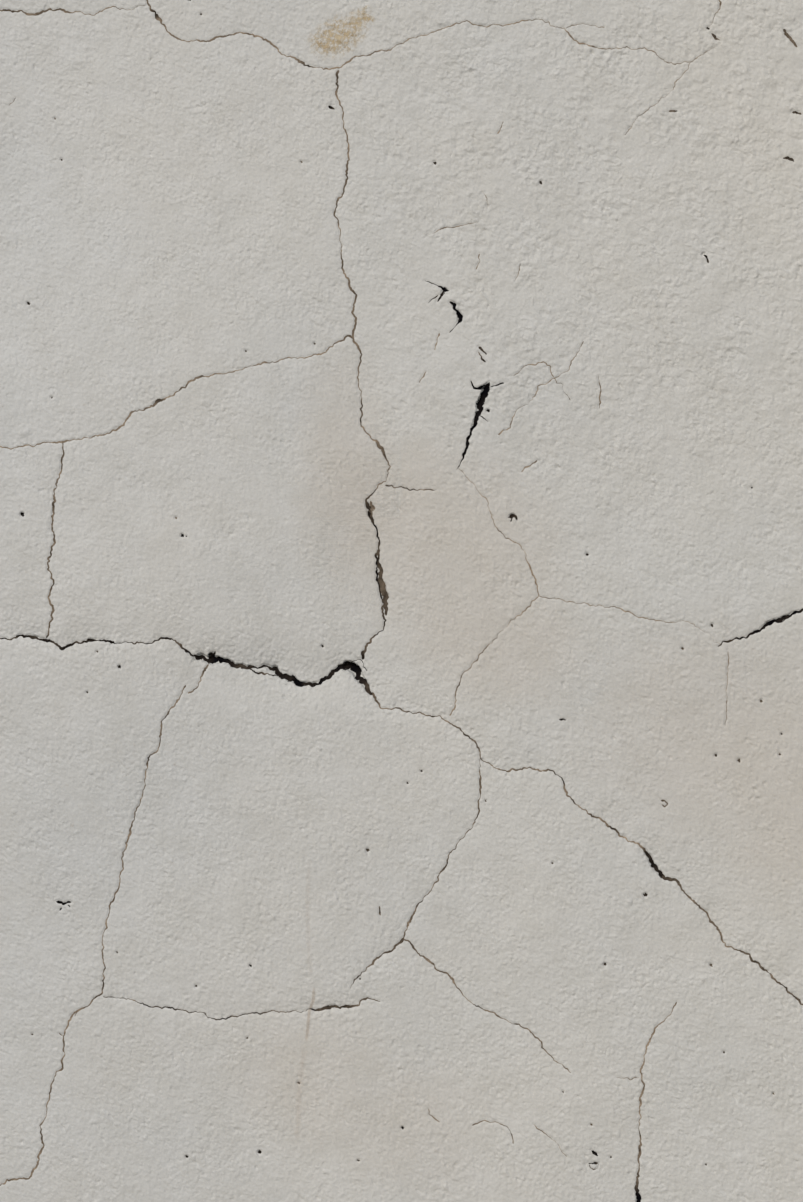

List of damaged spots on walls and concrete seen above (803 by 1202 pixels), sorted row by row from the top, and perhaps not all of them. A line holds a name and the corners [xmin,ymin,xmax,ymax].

crack [0,5,144,16]
crack [146,0,535,70]
crack [540,19,707,89]
crack [783,29,797,47]
crack [0,70,803,1005]
crack [0,685,186,1186]
crack [353,760,571,1073]
crack [124,997,380,1020]
crack [618,1002,677,1202]
crack [472,1120,567,1157]